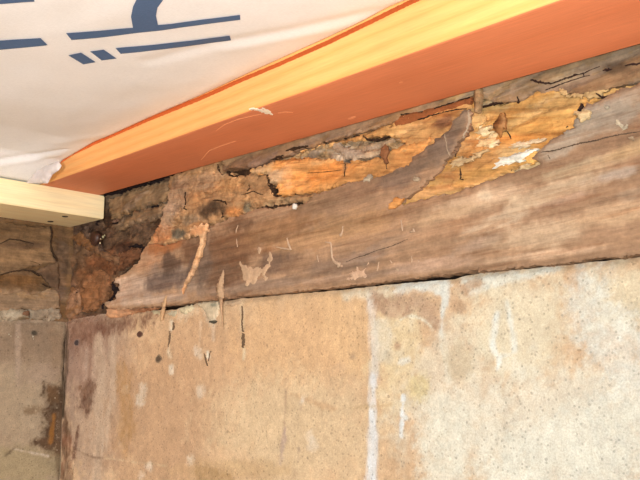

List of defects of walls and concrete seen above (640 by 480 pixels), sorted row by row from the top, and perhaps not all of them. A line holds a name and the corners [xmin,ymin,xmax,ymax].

peeling [559,88,610,102]
peeling [462,108,508,139]
peeling [573,109,592,123]
spalling [283,137,405,164]
spalling [168,300,242,330]
leakage [277,259,640,480]